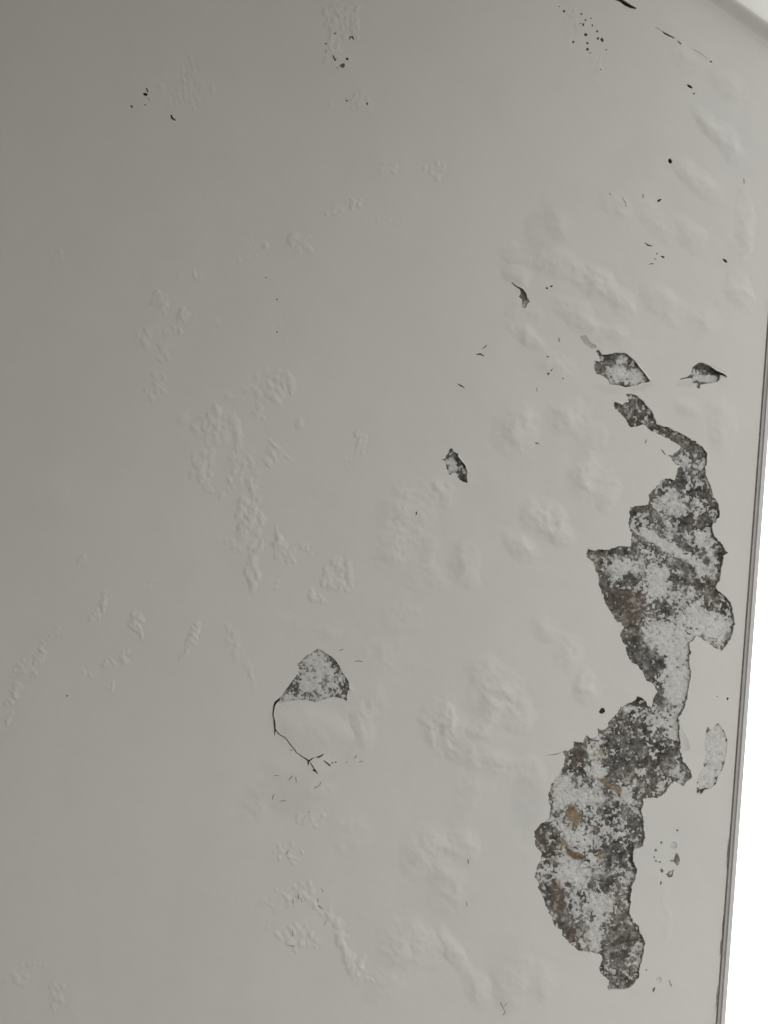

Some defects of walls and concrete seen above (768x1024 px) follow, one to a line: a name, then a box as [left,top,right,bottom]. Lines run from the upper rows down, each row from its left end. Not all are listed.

flaking render [512,283,529,308]
flaking render [442,448,469,483]
flaking render [279,649,355,707]
flaking render [534,335,734,992]
crack [272,697,362,801]